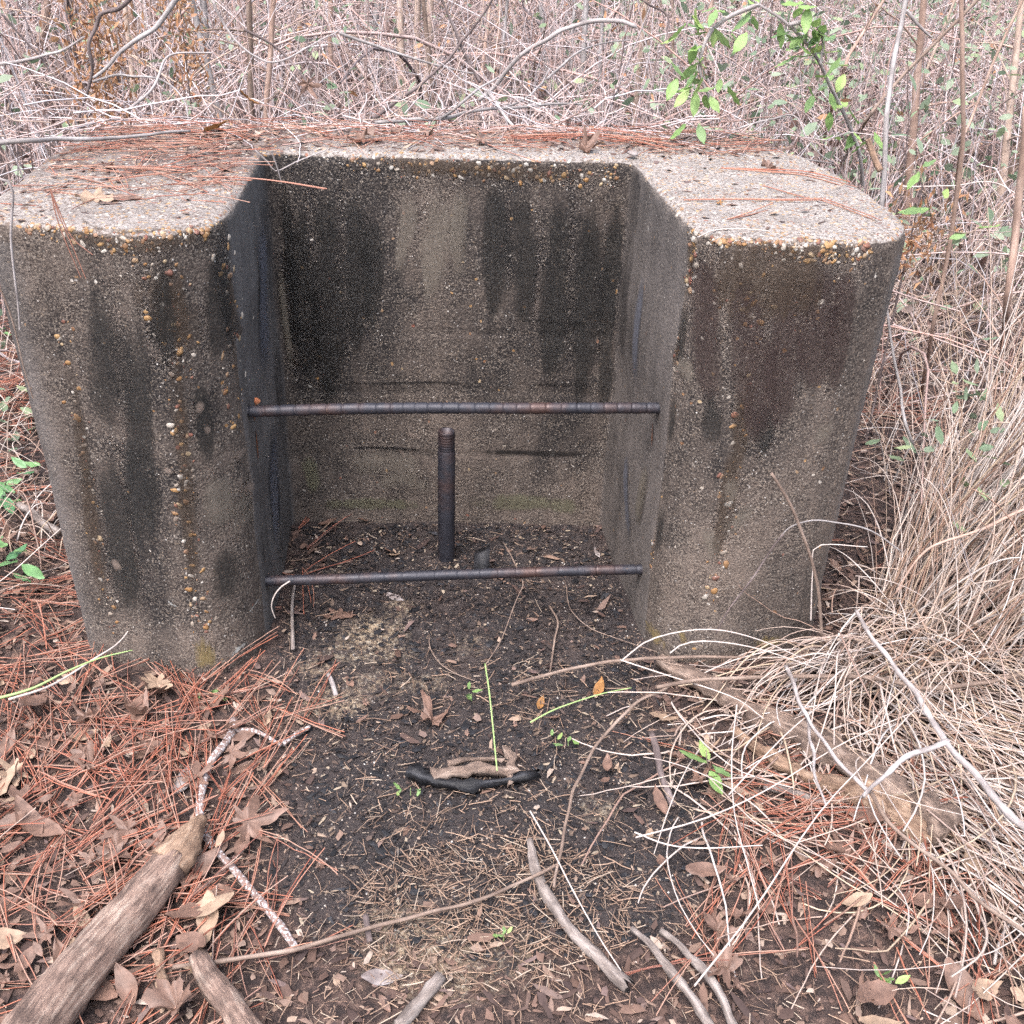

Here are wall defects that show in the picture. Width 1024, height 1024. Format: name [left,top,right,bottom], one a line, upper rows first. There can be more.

water stain [93,313,155,603]
water stain [283,205,381,396]
water stain [483,195,621,403]
water stain [679,266,719,436]
water stain [734,276,853,450]